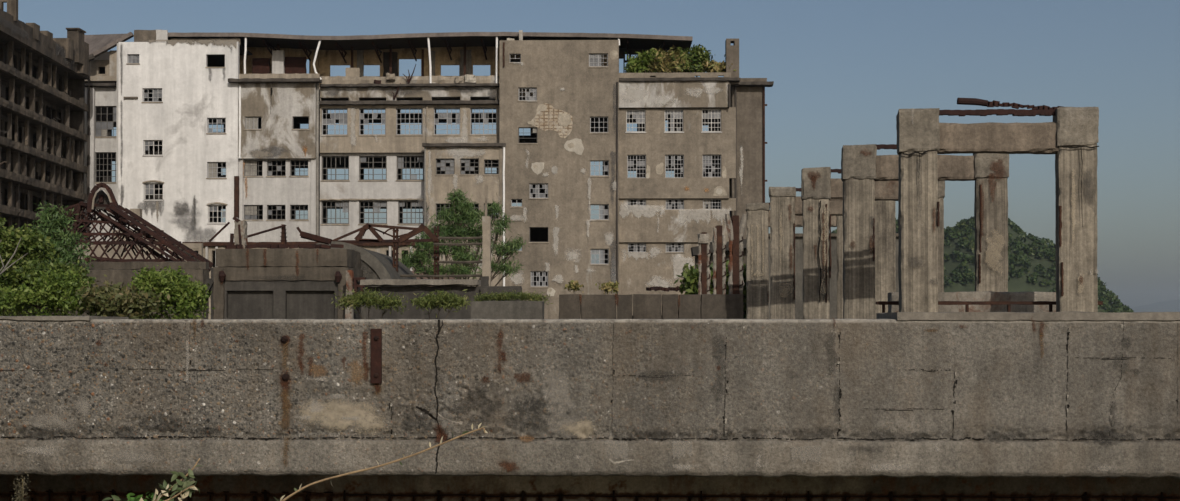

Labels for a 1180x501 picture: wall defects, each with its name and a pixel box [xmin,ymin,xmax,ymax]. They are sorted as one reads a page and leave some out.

spalling [528,103,584,155]
damp [138,197,216,242]
corrosion [497,332,530,382]
corrosion [280,334,324,464]
crack [1,320,1180,474]